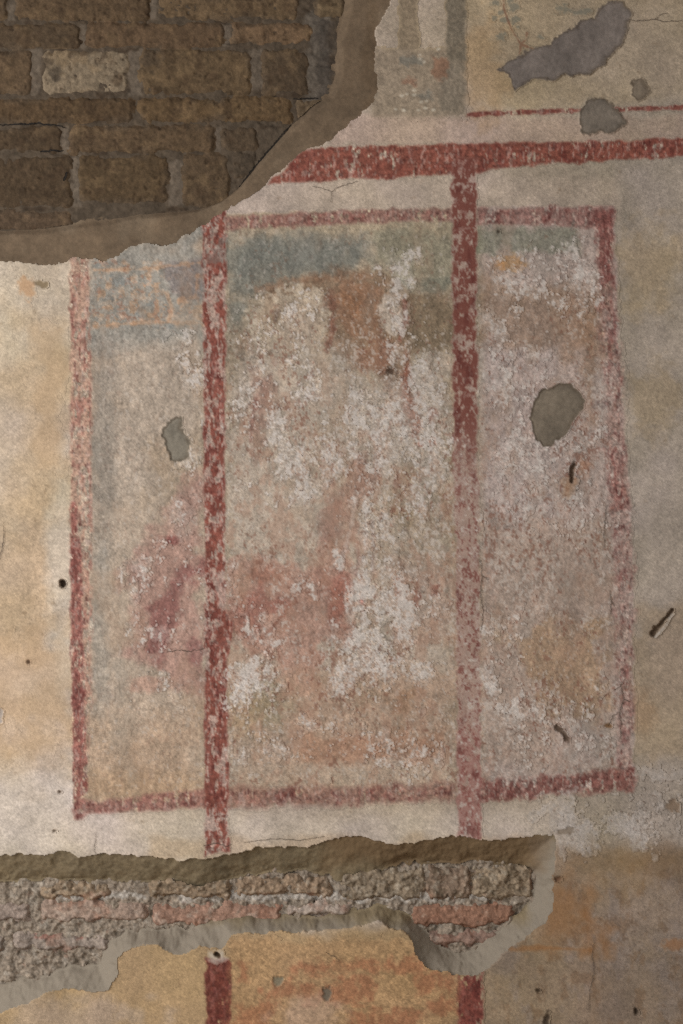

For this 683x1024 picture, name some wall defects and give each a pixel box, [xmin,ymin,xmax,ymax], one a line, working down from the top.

flaking render [0,0,391,265]
peeling [160,322,212,396]
peeling [170,243,471,786]
peeling [472,235,619,550]
flaking render [0,824,577,1013]